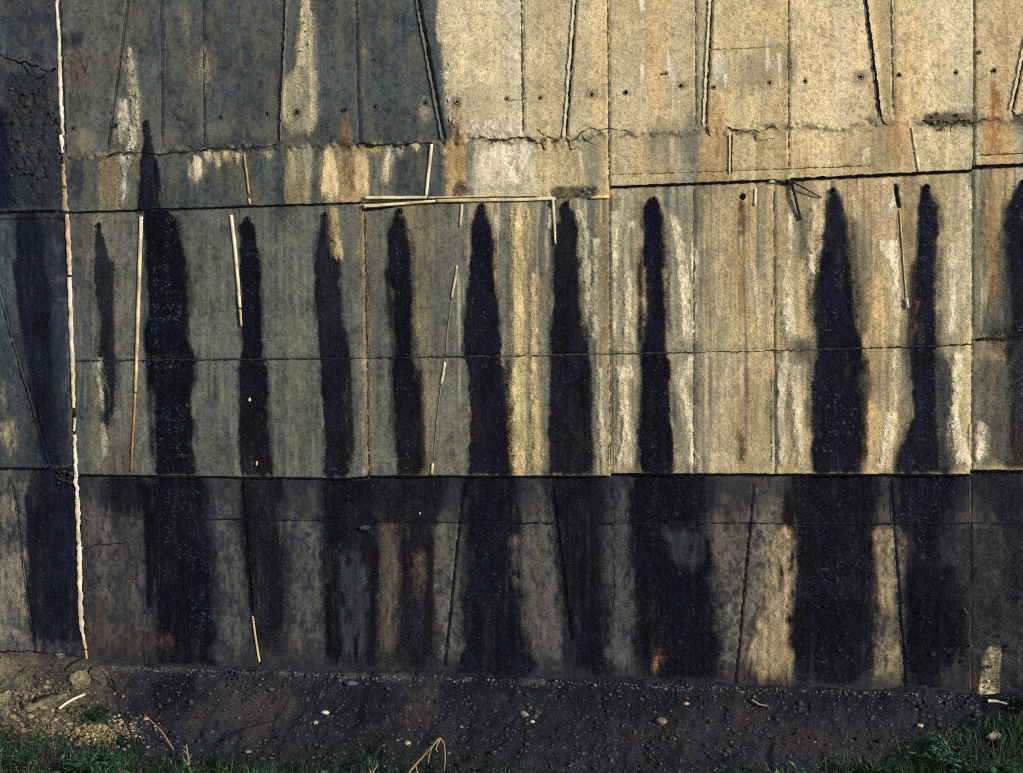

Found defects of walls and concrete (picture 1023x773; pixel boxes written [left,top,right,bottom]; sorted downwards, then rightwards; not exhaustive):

crack [0,54,57,80]
crack [0,111,58,142]
leakage [0,107,85,641]
leakage [90,228,120,459]
leakage [101,48,221,665]
leakage [237,220,291,650]
leakage [282,0,319,134]
leakage [283,143,449,669]
leakage [469,120,534,191]
crack [478,127,630,150]
leakage [458,199,726,679]
leakage [747,182,1023,687]